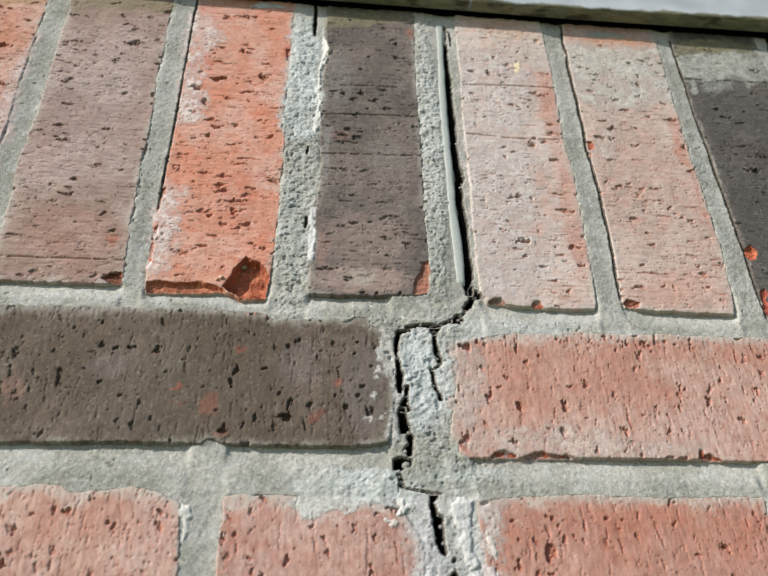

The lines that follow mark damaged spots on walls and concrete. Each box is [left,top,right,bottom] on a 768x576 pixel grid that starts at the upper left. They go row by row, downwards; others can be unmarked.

spalling [145,256,270,300]
crack [392,26,483,576]
water stain [288,467,448,576]
water stain [476,499,505,562]